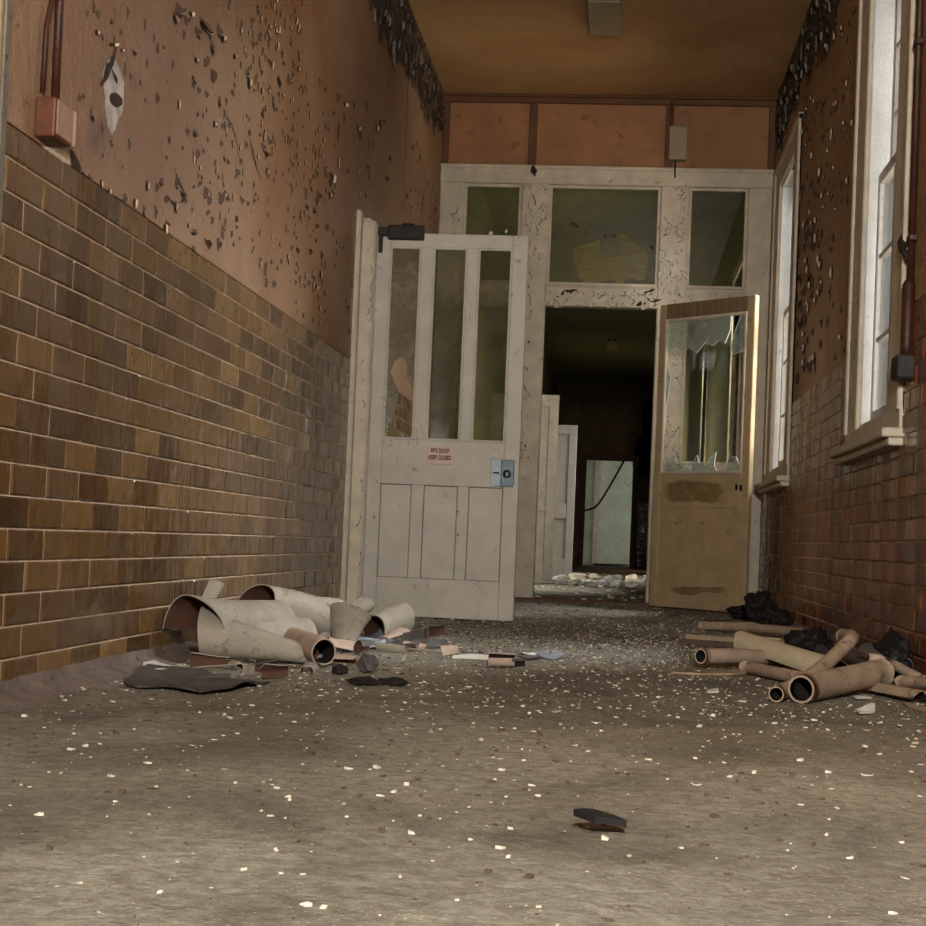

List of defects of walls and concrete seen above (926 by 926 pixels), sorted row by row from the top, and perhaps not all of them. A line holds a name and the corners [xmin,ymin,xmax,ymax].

spalling [86,0,142,158]
spalling [42,146,112,194]
peeling [121,0,370,325]
peeling [489,184,549,320]
peeling [544,187,697,310]
peeling [775,0,868,385]